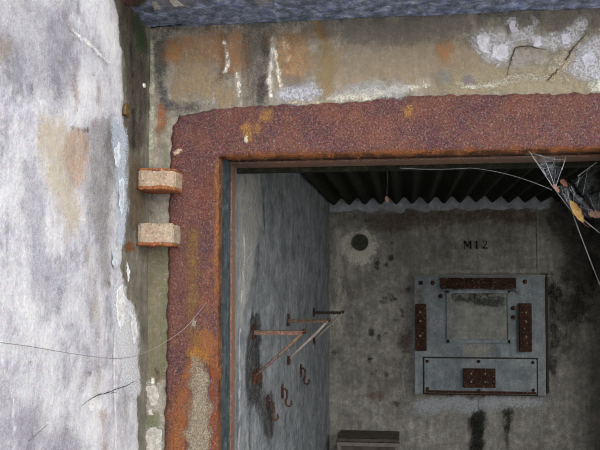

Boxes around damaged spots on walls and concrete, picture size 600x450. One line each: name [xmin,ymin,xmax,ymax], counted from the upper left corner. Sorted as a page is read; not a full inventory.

corrosion [262,20,335,85]
crack [506,45,545,75]
crack [546,29,587,81]
water stain [39,5,600,281]
corrosion [166,214,220,450]
peeling [184,357,213,450]
water stain [238,312,276,442]
water stain [467,400,487,450]
corrosion [423,390,536,399]
water stain [502,408,514,450]